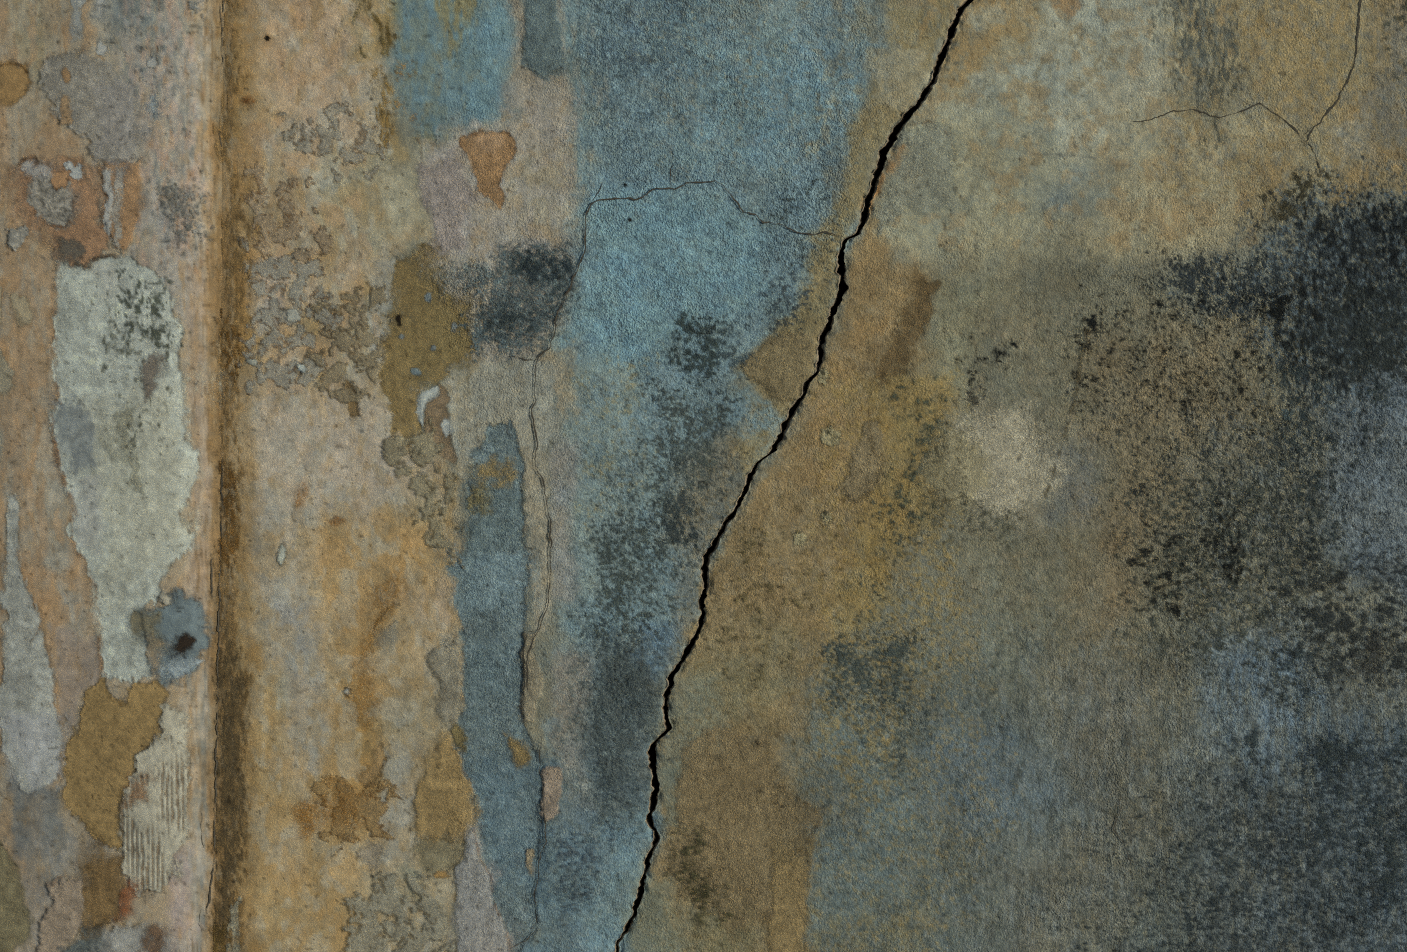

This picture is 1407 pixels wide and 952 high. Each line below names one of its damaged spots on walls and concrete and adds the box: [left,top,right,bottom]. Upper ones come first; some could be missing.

peeling [0,0,210,952]
peeling [279,103,389,182]
peeling [238,130,564,952]
crack [508,0,974,952]
damp [864,156,1407,952]
crack [1134,0,1362,178]